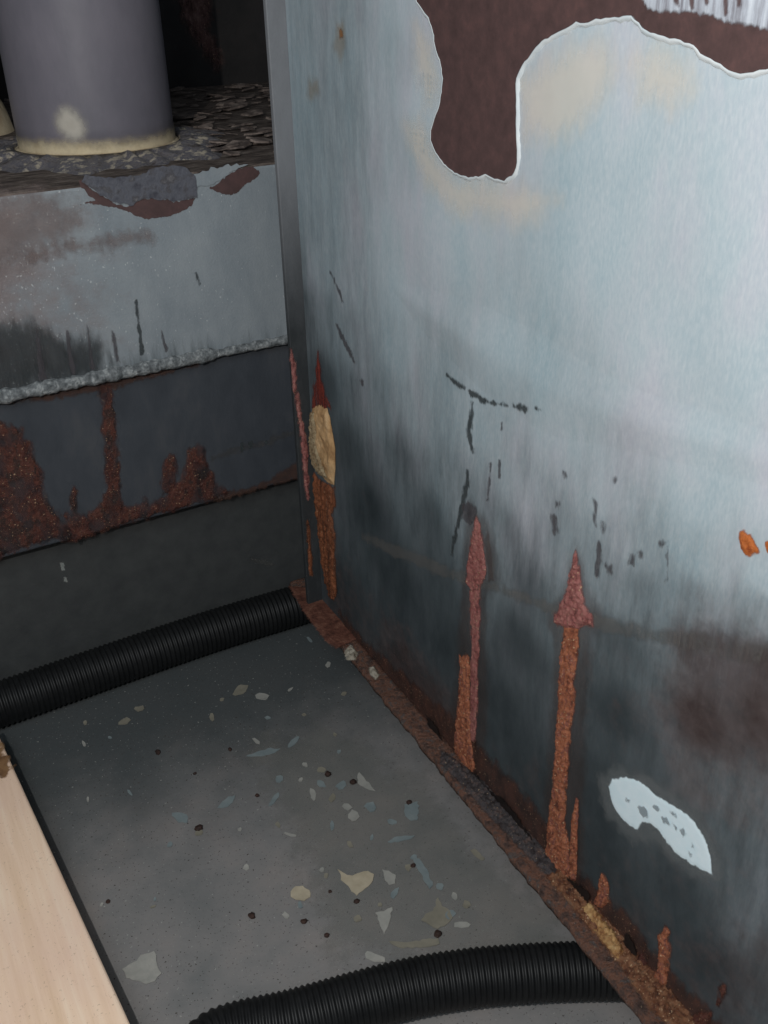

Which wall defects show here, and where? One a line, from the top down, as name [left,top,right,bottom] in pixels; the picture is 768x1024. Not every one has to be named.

peeling [415,0,768,184]
peeling [79,163,260,220]
corrosion [14,364,228,542]
corrosion [290,349,337,600]
crack [452,404,501,554]
corrosion [739,531,768,557]
corrosion [340,502,726,1024]
peeling [601,770,719,879]